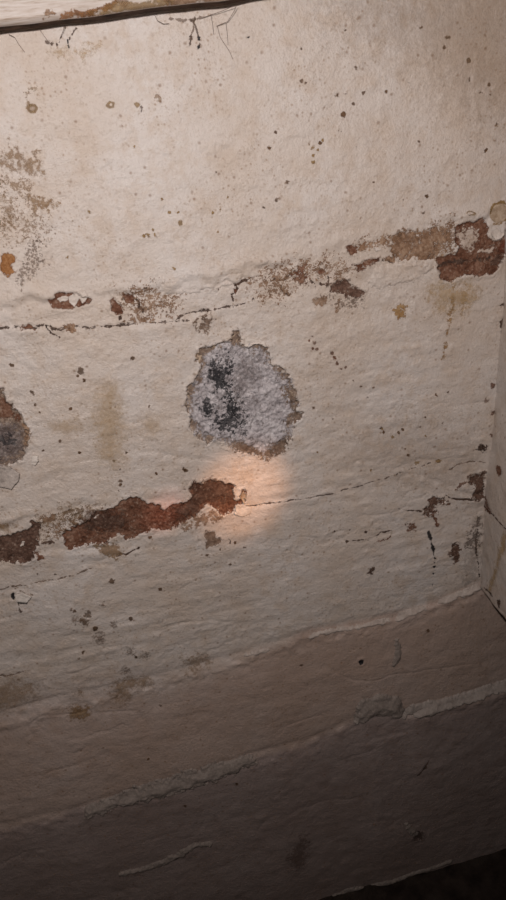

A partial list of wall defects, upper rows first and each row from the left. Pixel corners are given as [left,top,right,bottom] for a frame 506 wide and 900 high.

spalling [231,213,506,313]
peeling [48,291,92,310]
crack [0,298,254,338]
peeling [110,273,187,327]
crack [246,461,485,506]
spalling [0,478,251,564]